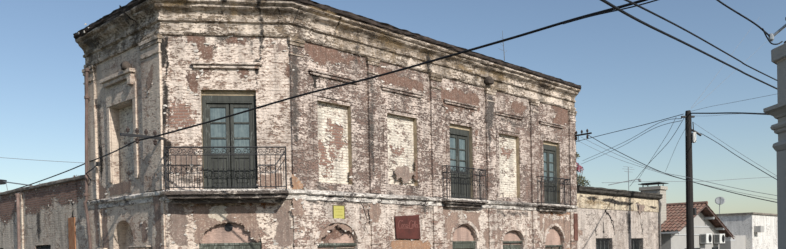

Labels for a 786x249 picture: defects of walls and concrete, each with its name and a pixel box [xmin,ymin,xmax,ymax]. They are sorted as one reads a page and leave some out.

flaking render [304,42,363,66]
flaking render [162,35,215,130]
damp [160,36,172,187]
flaking render [540,106,569,129]
flaking render [318,118,348,179]
flaking render [0,175,131,249]
flaking render [140,195,261,249]
flaking render [256,173,306,248]
flaking render [316,223,356,245]
flaking render [391,239,432,249]
flaking render [442,206,502,249]
crack [586,209,615,236]